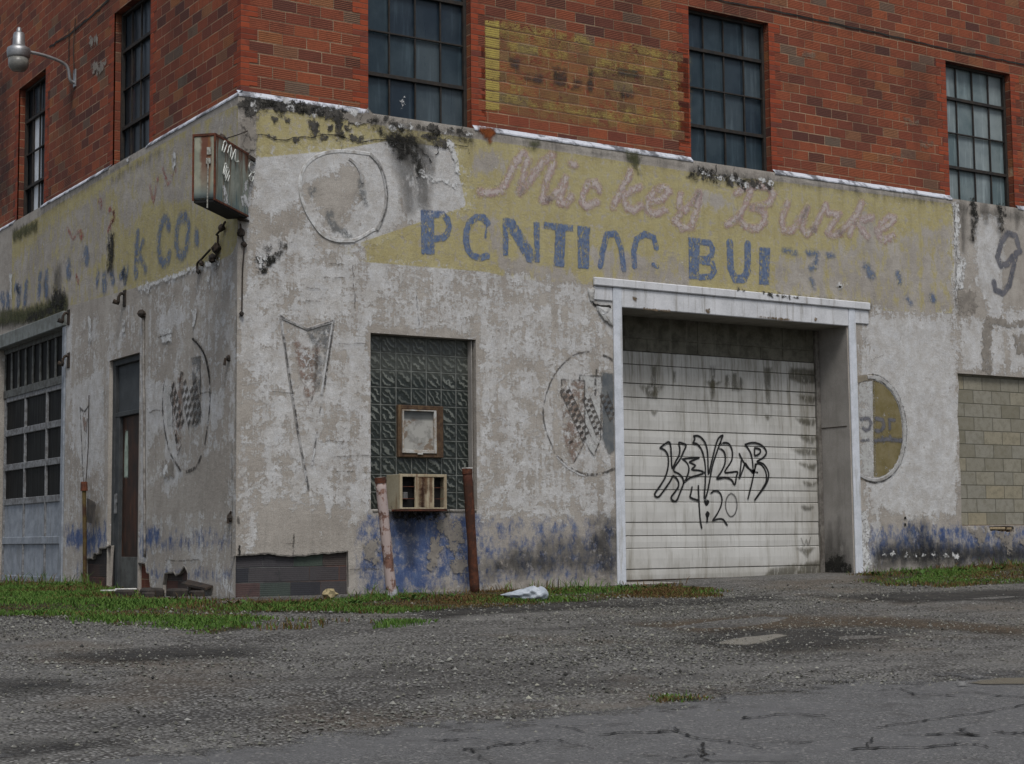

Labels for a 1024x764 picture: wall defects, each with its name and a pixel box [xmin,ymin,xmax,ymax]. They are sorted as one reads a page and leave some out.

water stain [371,119,450,179]
water stain [0,286,68,326]
peeling [951,202,1024,375]
water stain [710,369,742,392]
water stain [797,419,817,469]
flaking render [138,562,202,590]
water stain [767,548,852,575]